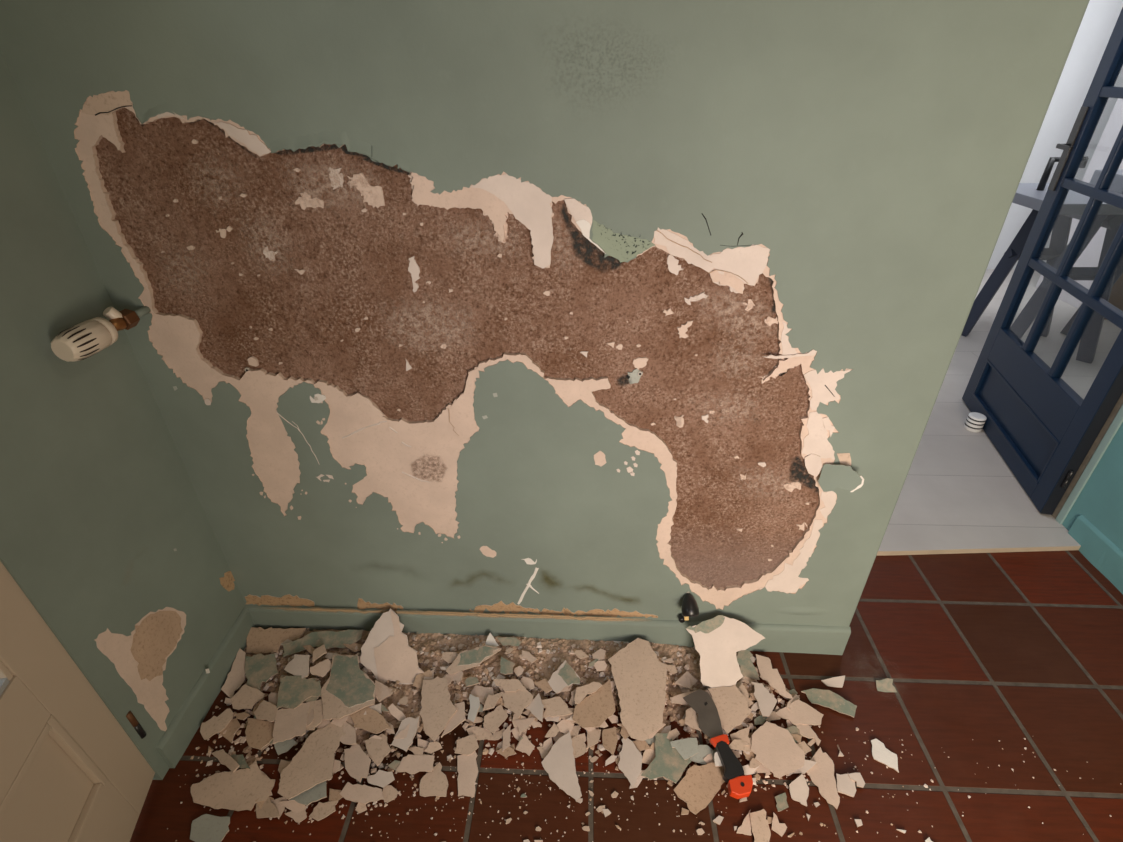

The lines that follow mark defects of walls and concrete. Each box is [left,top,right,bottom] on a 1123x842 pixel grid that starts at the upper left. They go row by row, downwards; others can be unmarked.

flaking render [75,90,864,815]